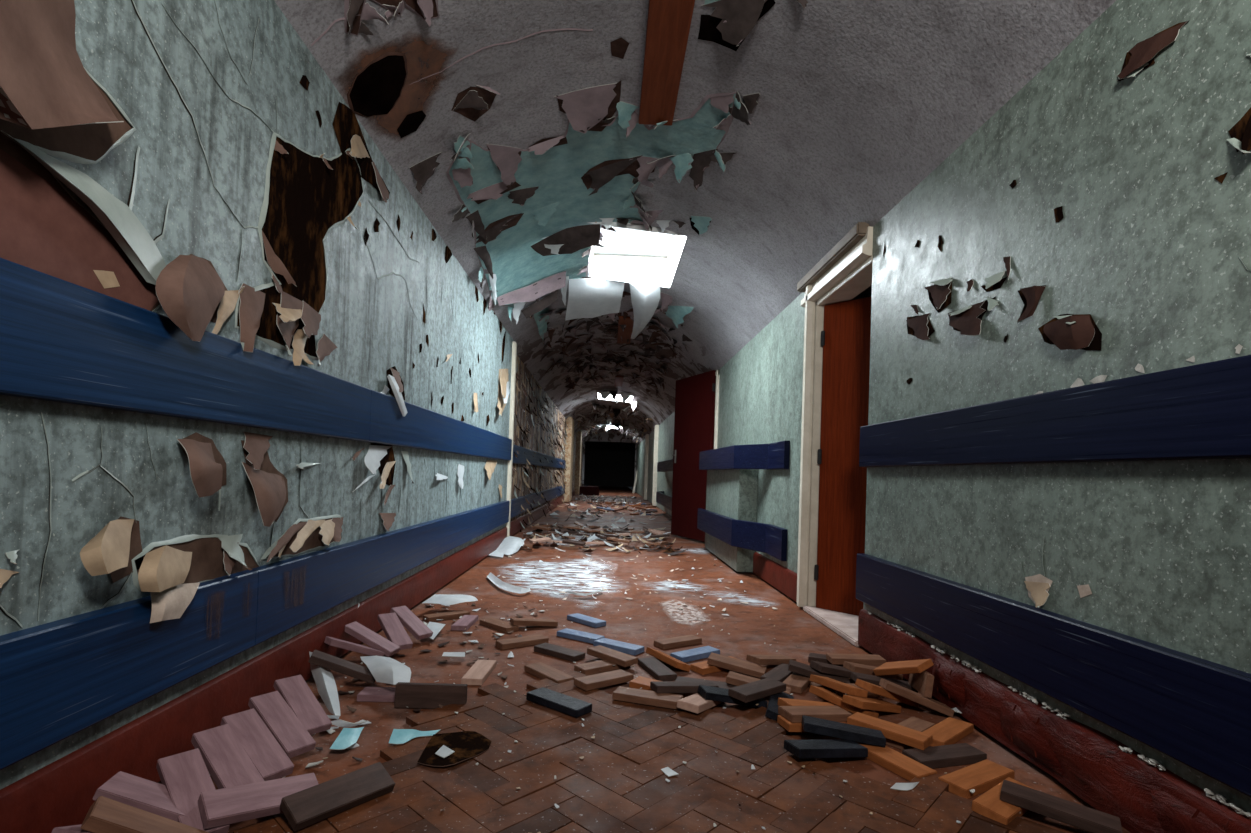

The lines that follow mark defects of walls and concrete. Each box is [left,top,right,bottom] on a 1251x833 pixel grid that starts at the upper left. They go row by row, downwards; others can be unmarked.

peeling [344,0,439,36]
peeling [610,37,629,59]
peeling [698,0,776,51]
peeling [1118,20,1190,82]
peeling [1226,107,1251,154]
peeling [0,0,408,366]
peeling [1054,206,1064,223]
peeling [380,81,760,532]
peeling [906,256,1102,351]
crack [0,412,157,628]
peeling [80,432,344,623]
peeling [352,443,414,532]